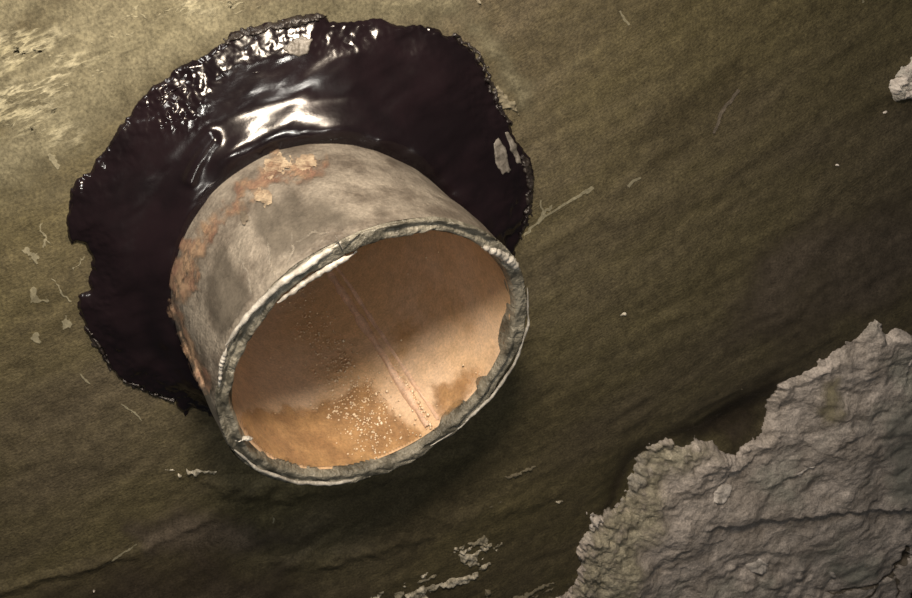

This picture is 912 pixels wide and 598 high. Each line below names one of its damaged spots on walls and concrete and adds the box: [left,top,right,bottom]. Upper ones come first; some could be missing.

spalling [889,57,912,101]
corrosion [169,151,328,393]
spalling [513,319,912,598]
crack [829,565,900,598]